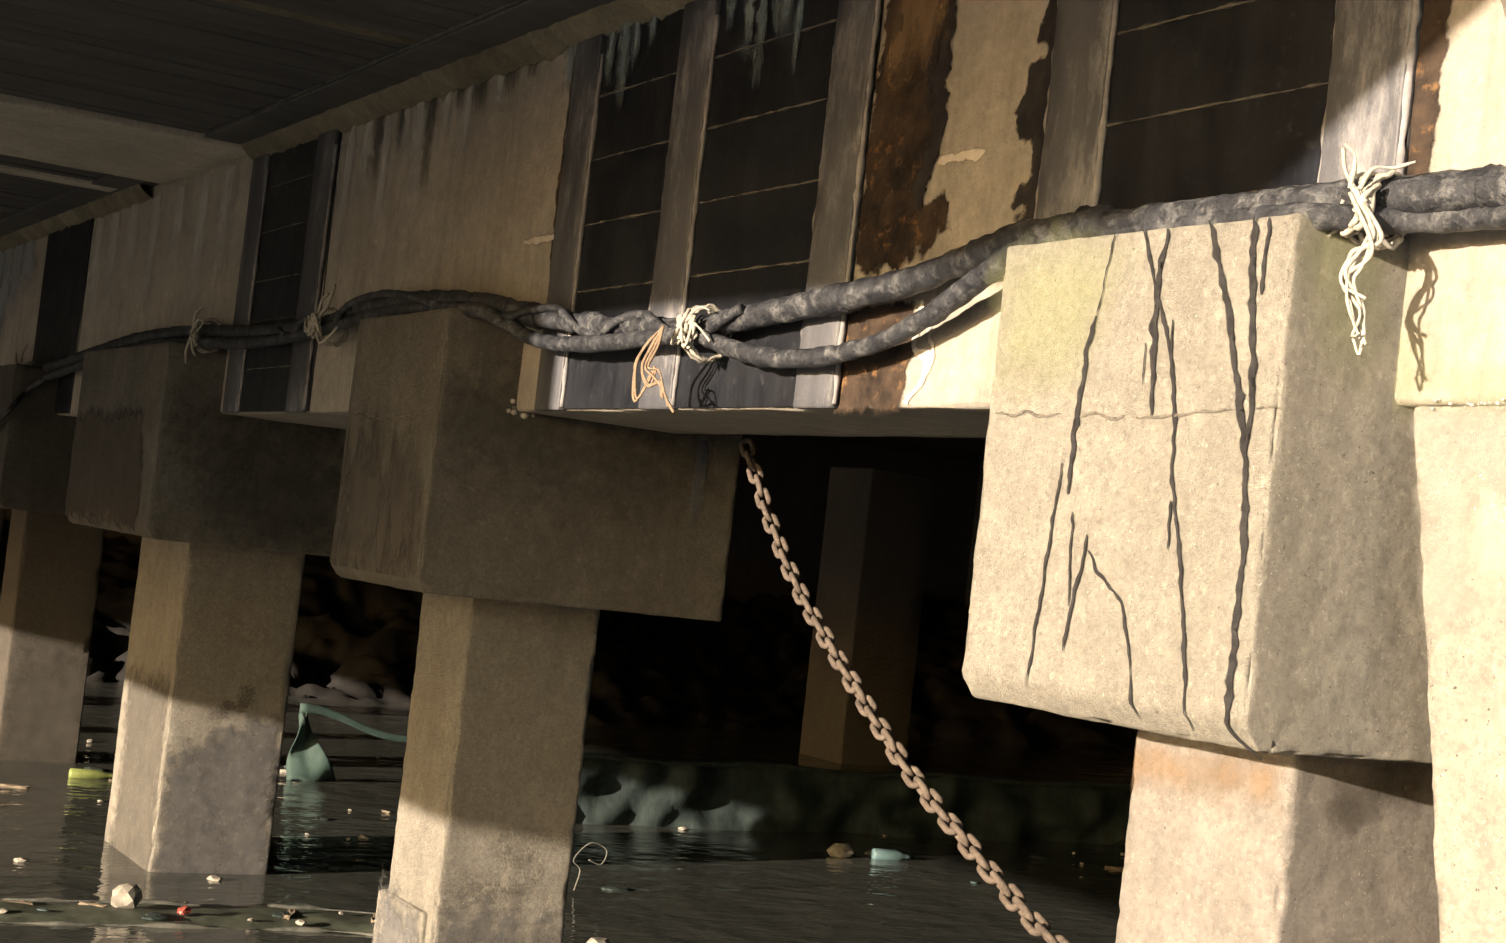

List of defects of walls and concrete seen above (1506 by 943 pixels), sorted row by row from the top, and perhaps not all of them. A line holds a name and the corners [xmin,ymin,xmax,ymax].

water stain [606,15,656,94]
water stain [728,0,803,48]
corrosion [856,0,957,276]
corrosion [834,300,914,413]
crack [995,216,1277,761]
water stain [110,672,281,875]
water stain [374,890,418,943]